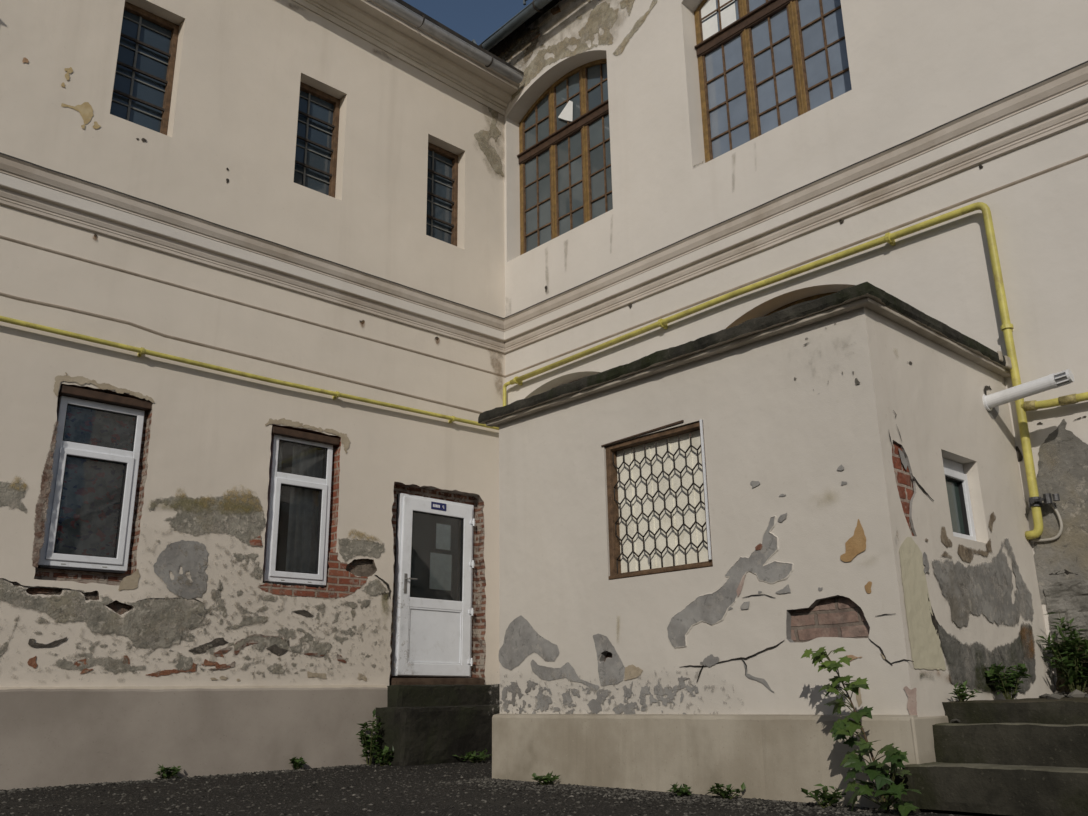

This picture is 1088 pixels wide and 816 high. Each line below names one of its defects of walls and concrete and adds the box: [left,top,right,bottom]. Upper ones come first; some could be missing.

peeling [489,0,657,102]
peeling [61,102,101,129]
peeling [474,108,504,176]
peeling [53,372,155,403]
peeling [0,421,58,567]
peeling [0,490,384,681]
peeling [490,615,734,715]
peeling [667,513,794,649]
crack [682,640,784,692]
flaking render [786,587,870,643]
peeling [840,519,866,562]
peeling [889,410,1088,697]